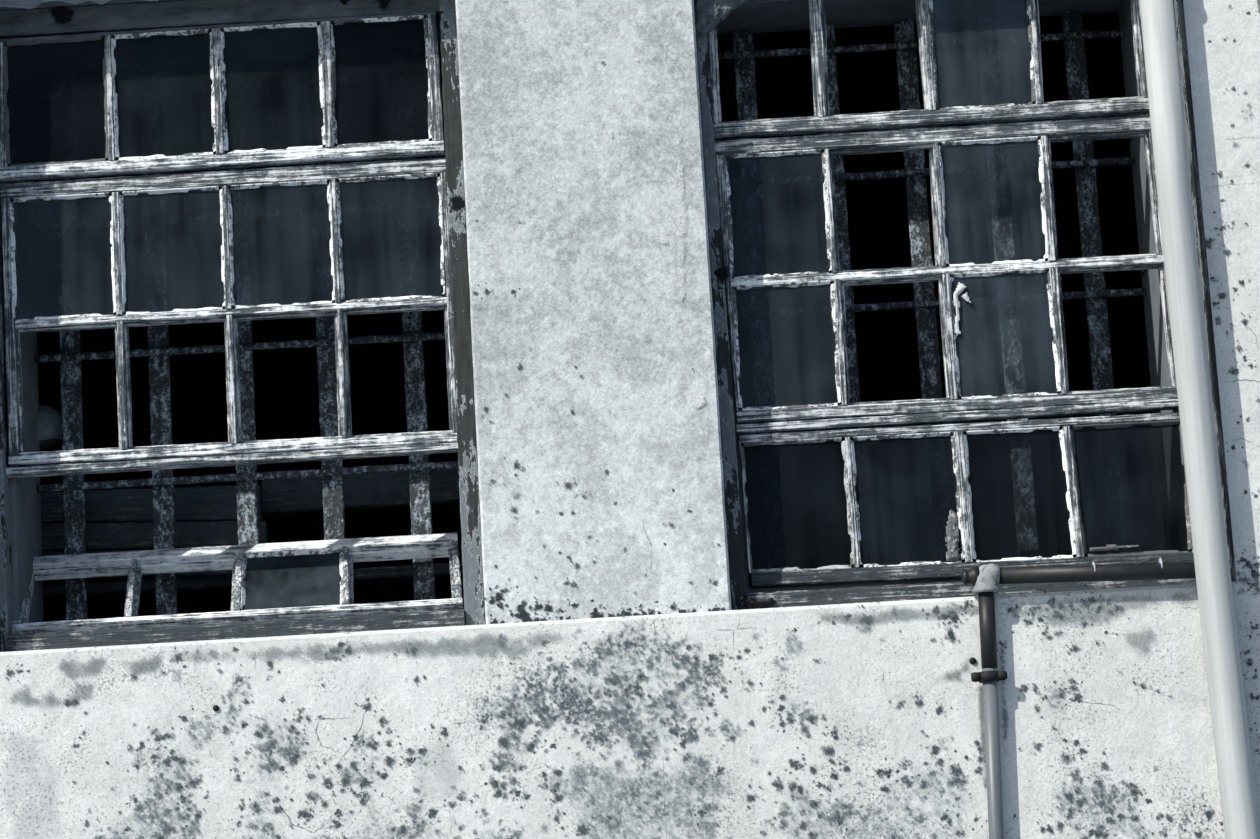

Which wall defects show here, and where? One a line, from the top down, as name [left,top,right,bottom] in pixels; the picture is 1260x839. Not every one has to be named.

leakage [324,627,359,660]
leakage [493,544,596,617]
leakage [818,602,879,632]
leakage [922,594,974,643]
leakage [6,658,103,748]
leakage [997,588,1223,839]